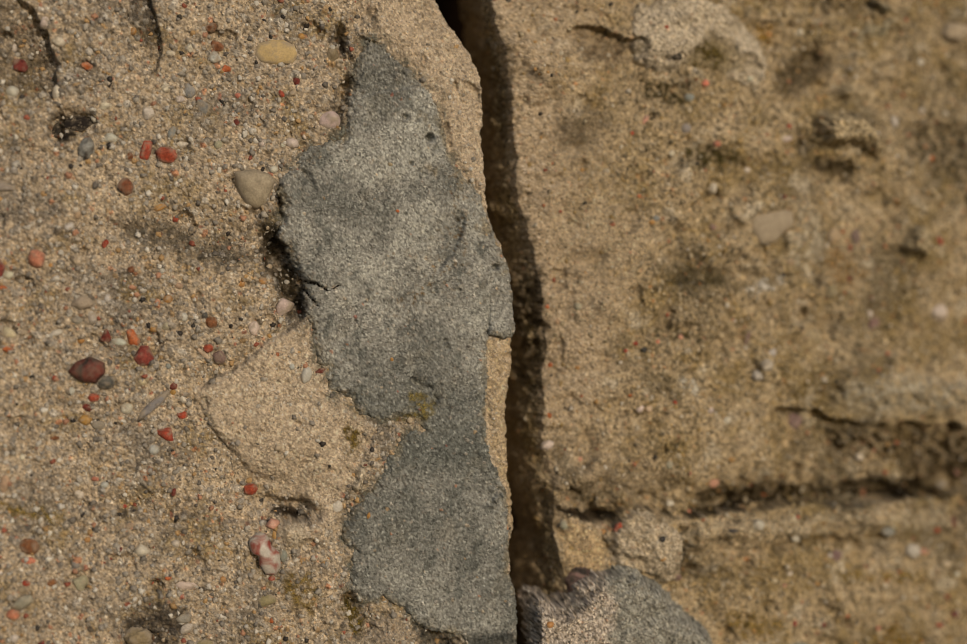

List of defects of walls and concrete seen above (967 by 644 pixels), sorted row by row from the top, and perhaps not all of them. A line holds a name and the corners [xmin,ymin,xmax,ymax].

crack [435,0,468,48]
crack [338,37,346,59]
crack [842,481,945,500]
crack [272,505,307,518]
crack [508,507,516,541]
crack [557,506,615,522]
crack [685,493,793,518]